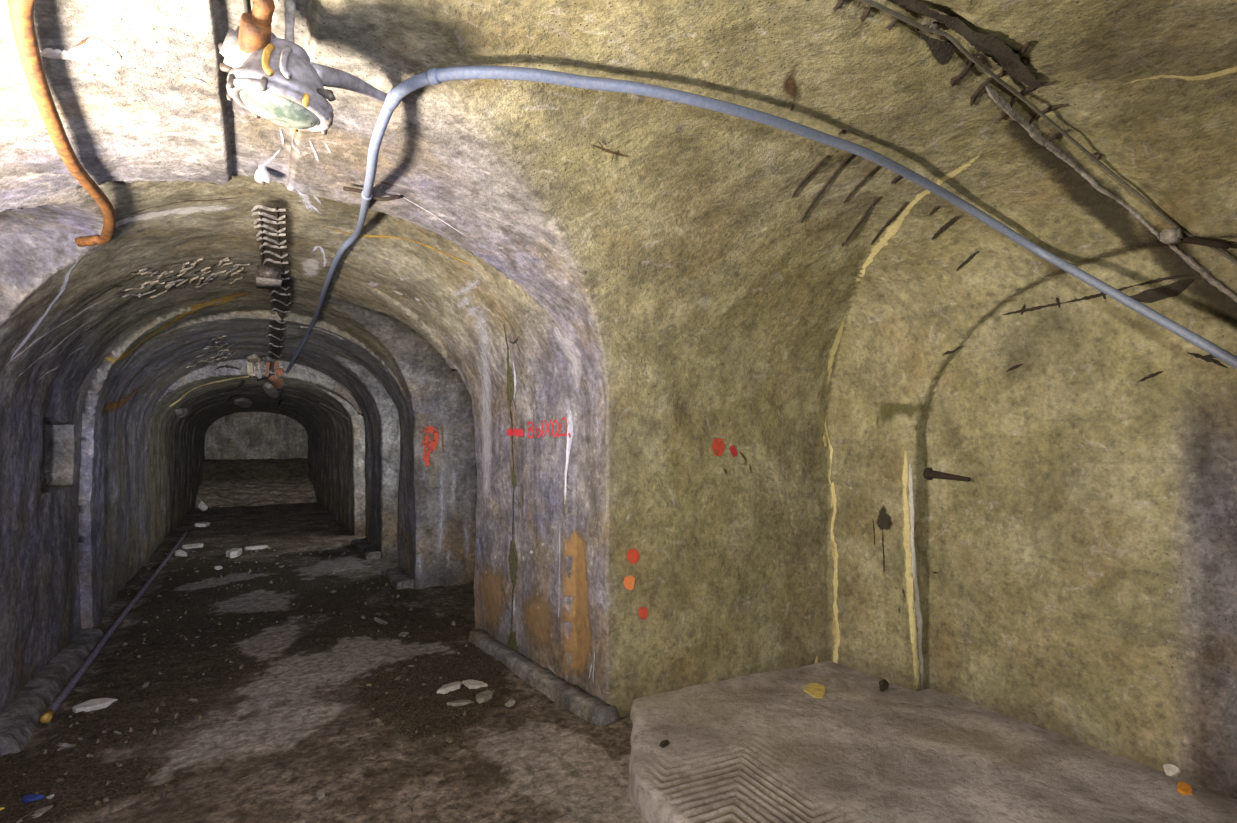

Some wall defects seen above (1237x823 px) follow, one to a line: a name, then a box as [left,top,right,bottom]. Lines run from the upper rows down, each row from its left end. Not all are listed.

corrosion [524,532,591,673]